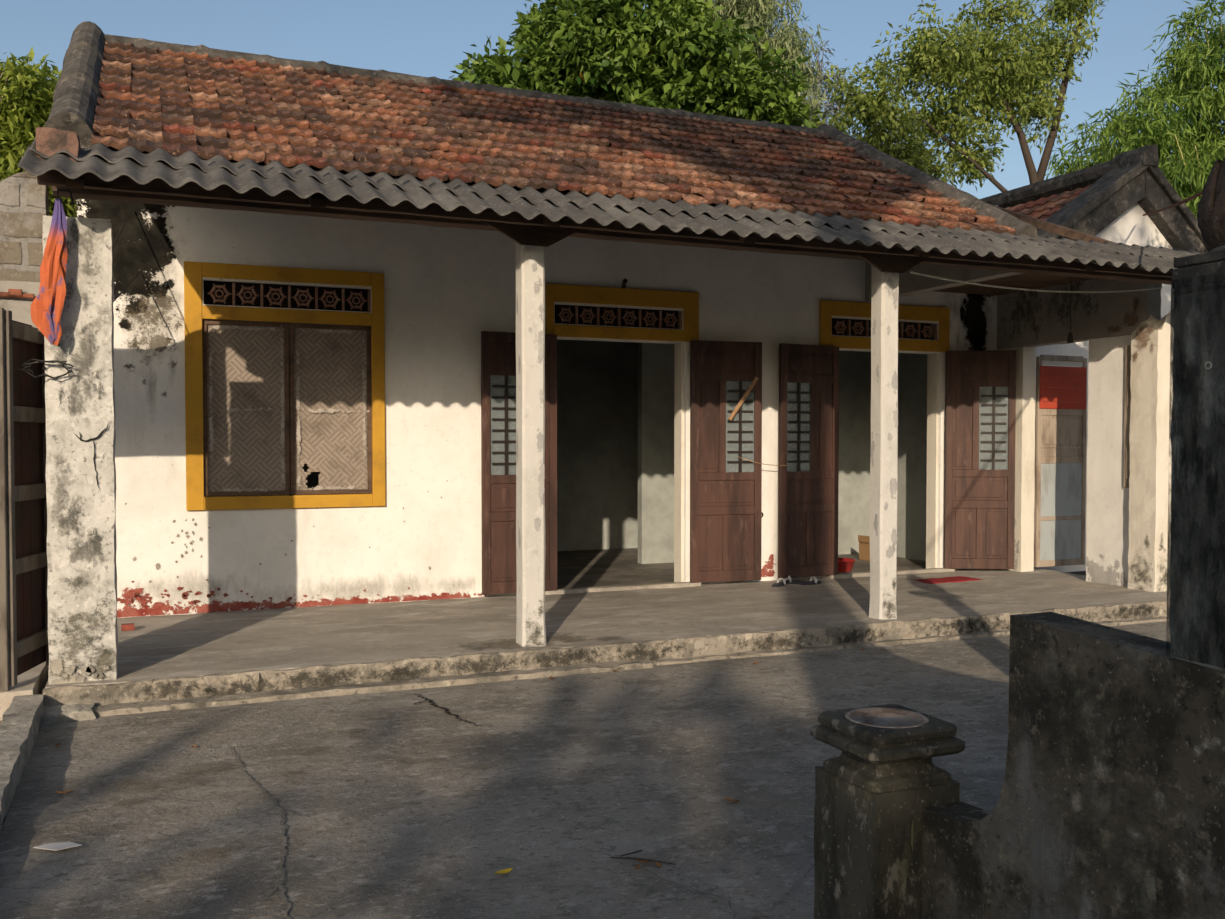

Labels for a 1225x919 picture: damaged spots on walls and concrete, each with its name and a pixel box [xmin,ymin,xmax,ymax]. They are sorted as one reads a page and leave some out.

damp [62,197,183,368]
damp [54,323,104,415]
crack [75,422,110,493]
damp [52,458,105,566]
peeling [117,519,486,618]
crack [413,694,480,726]